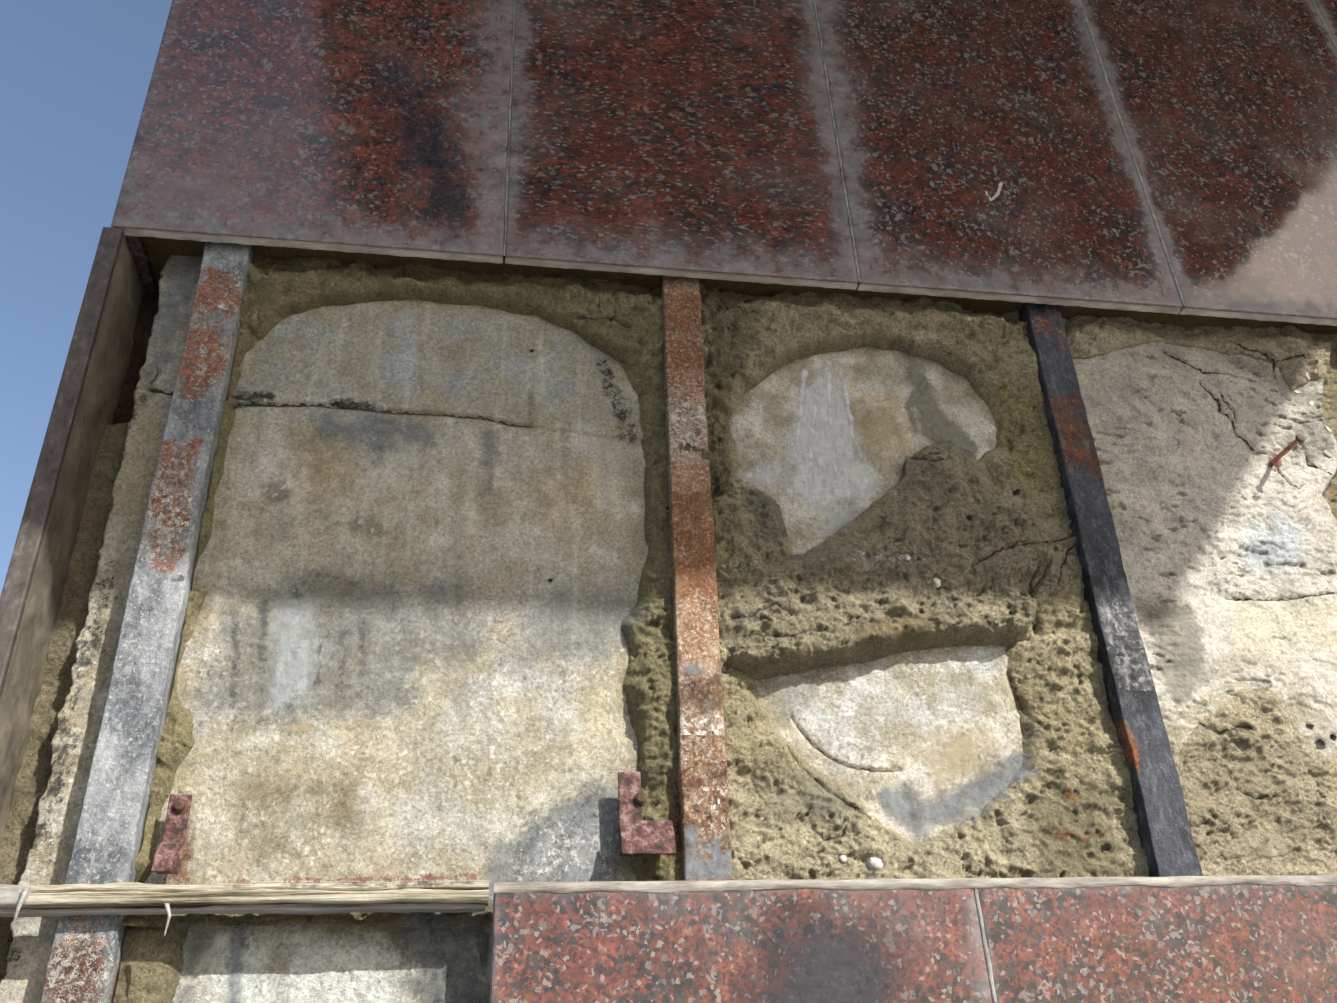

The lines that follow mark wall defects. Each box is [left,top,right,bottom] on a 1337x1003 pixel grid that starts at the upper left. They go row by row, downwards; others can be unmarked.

crack [1230,341,1307,380]
spalling [333,395,387,412]
crack [229,394,531,427]
crack [1164,352,1336,489]
rust [671,490,717,605]
rust [1124,729,1141,774]
rust [667,756,728,857]
rust [163,827,194,885]